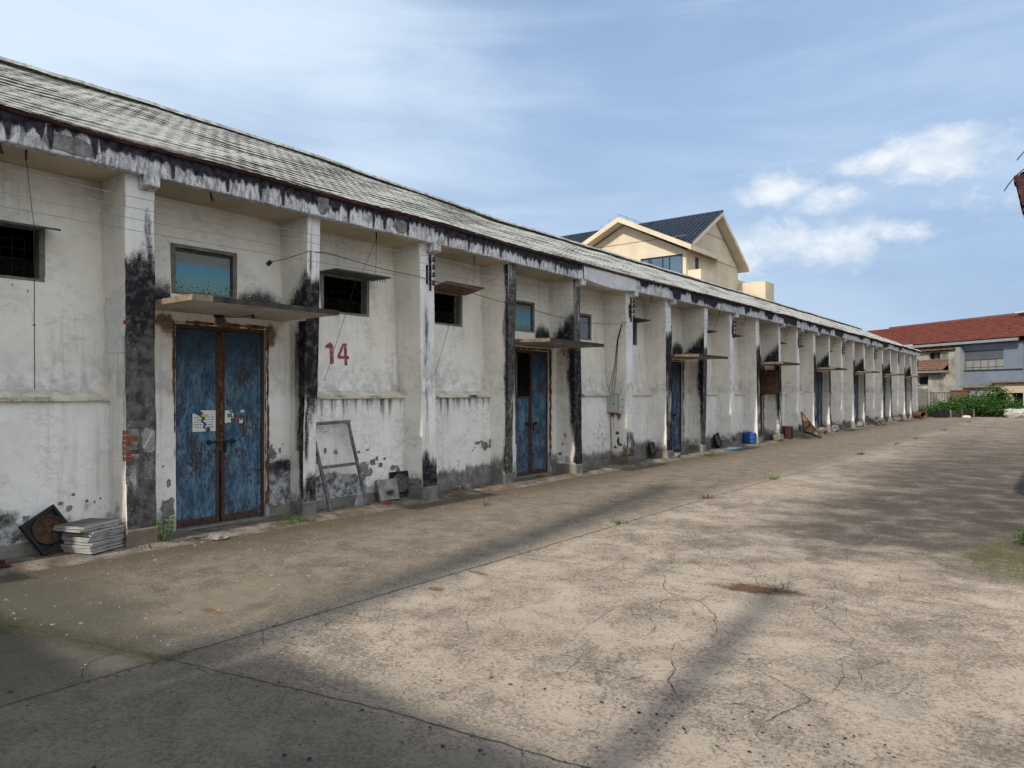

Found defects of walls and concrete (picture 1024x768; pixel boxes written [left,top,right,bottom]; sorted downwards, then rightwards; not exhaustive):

damp [0,110,743,530]
flaking render [122,427,155,463]
crack [528,526,781,701]